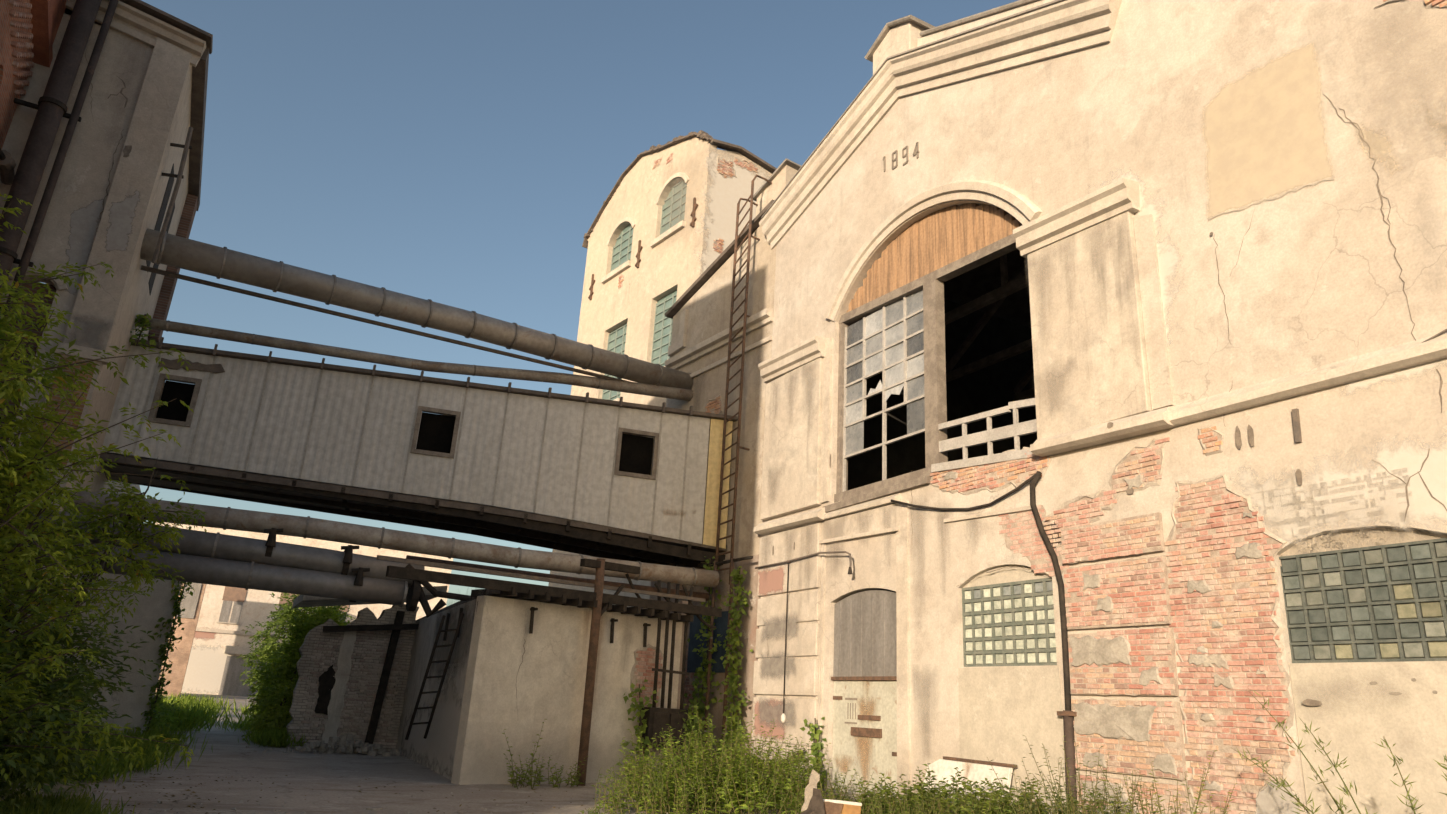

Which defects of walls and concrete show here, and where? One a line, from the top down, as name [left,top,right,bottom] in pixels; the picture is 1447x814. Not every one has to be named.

flaking render [1422,0,1447,9]
flaking render [64,199,103,295]
crack [1213,209,1255,344]
crack [1323,94,1416,341]
crack [1435,369,1443,413]
flaking render [930,447,1051,495]
flaking render [1197,424,1254,456]
crack [1372,448,1447,523]
flaking render [998,437,1322,814]
flaking render [630,644,664,711]